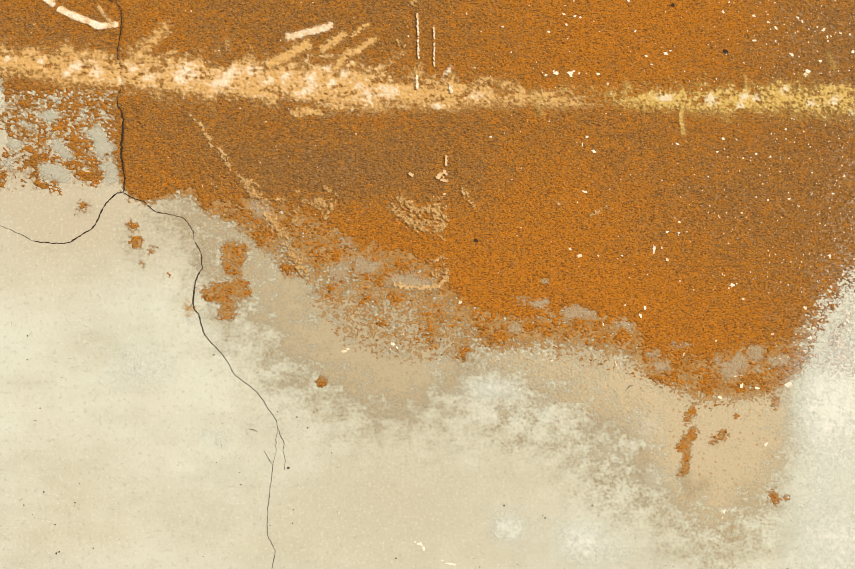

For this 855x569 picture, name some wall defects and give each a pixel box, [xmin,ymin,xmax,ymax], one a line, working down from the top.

crack [0,0,286,568]
corrosion [0,0,855,427]
damp [174,196,855,569]
corrosion [674,426,700,477]
corrosion [708,429,729,445]